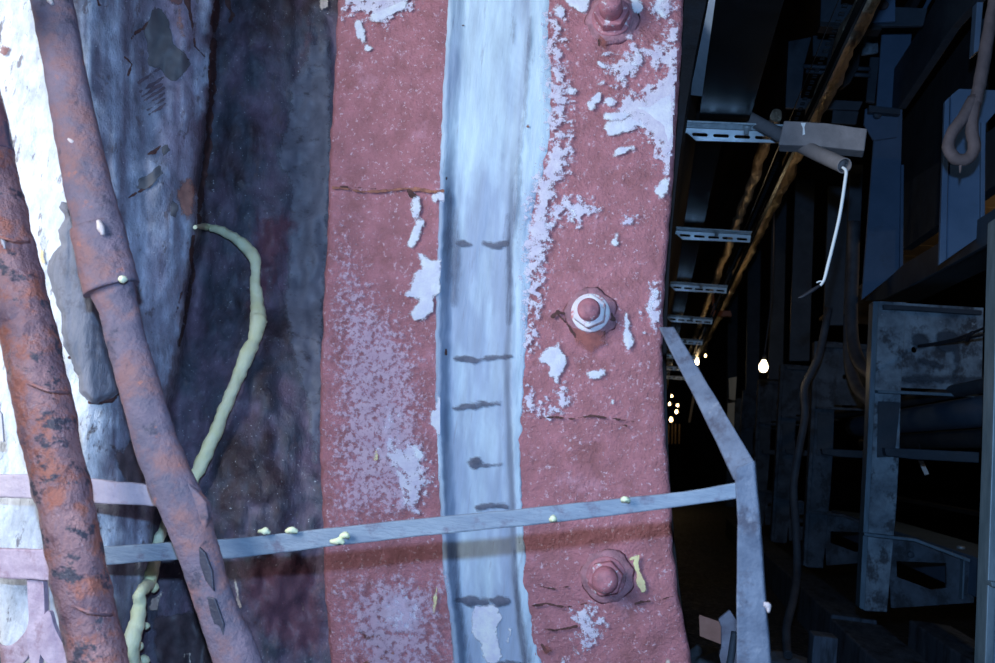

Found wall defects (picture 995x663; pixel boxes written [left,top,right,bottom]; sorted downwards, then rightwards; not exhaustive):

spalling [131,8,190,81]
peeling [341,0,419,51]
peeling [553,0,590,18]
peeling [587,0,679,182]
crack [332,186,444,198]
peeling [569,600,608,654]